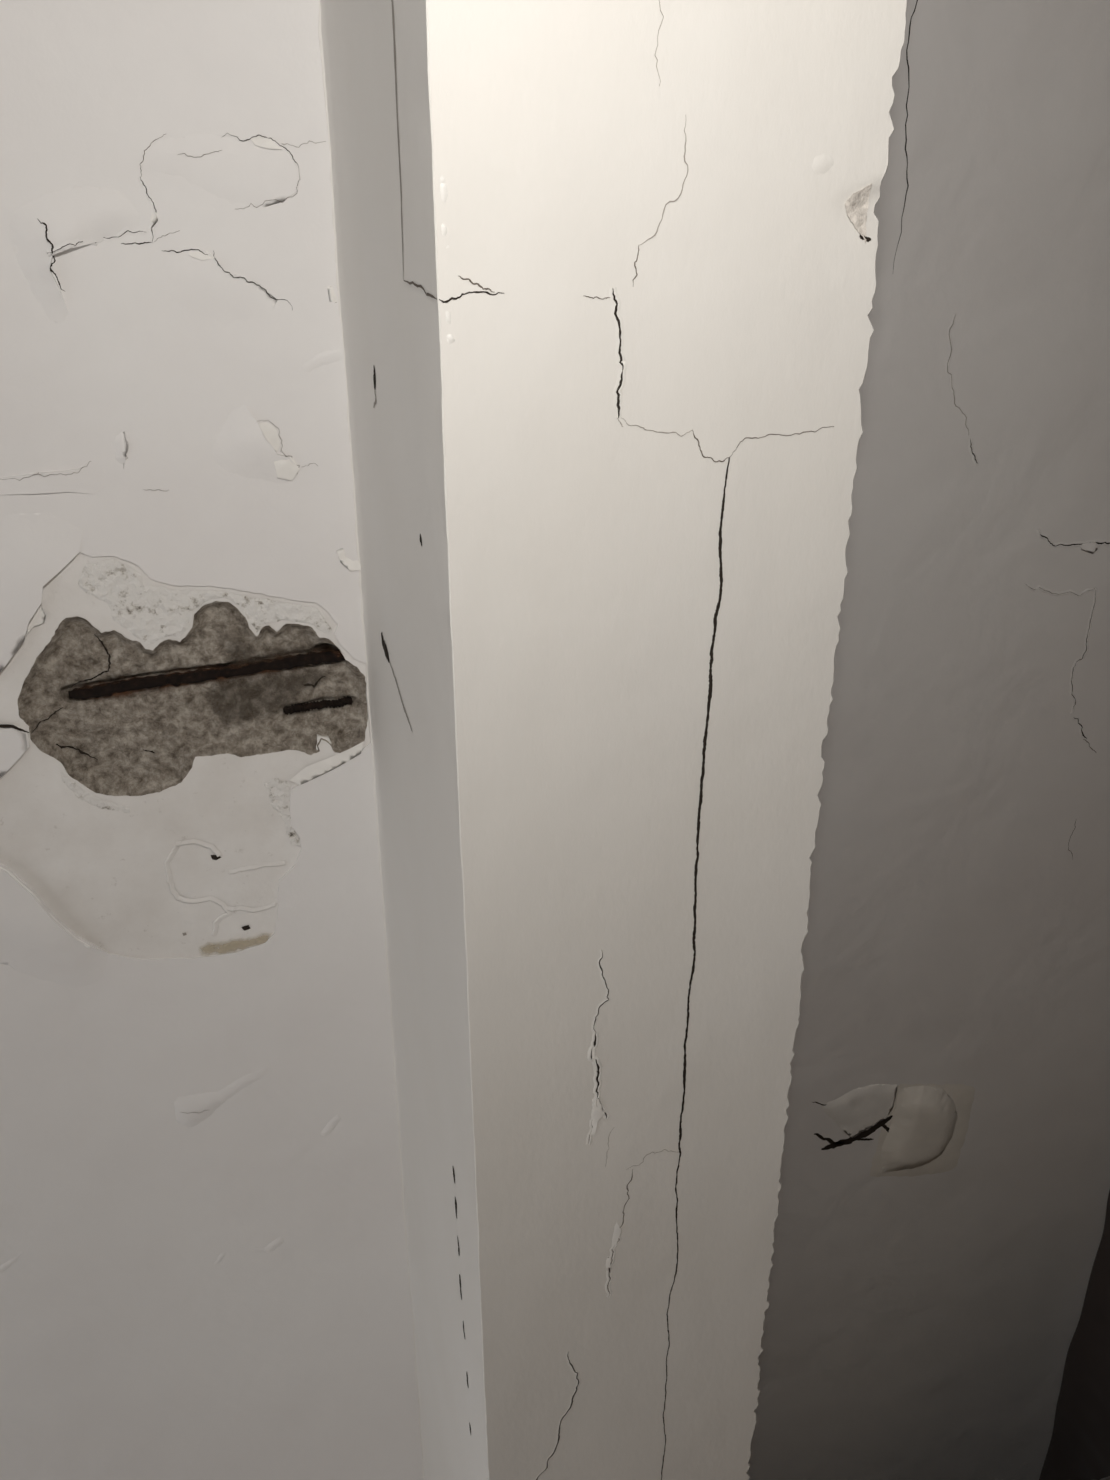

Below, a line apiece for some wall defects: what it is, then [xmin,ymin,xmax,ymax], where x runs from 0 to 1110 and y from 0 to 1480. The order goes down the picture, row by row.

crack [391,0,501,303]
crack [655,1,664,86]
crack [893,0,918,269]
spalling [0,513,370,987]
crack [583,124,834,1480]
crack [1024,528,1110,752]
crack [534,1351,581,1480]